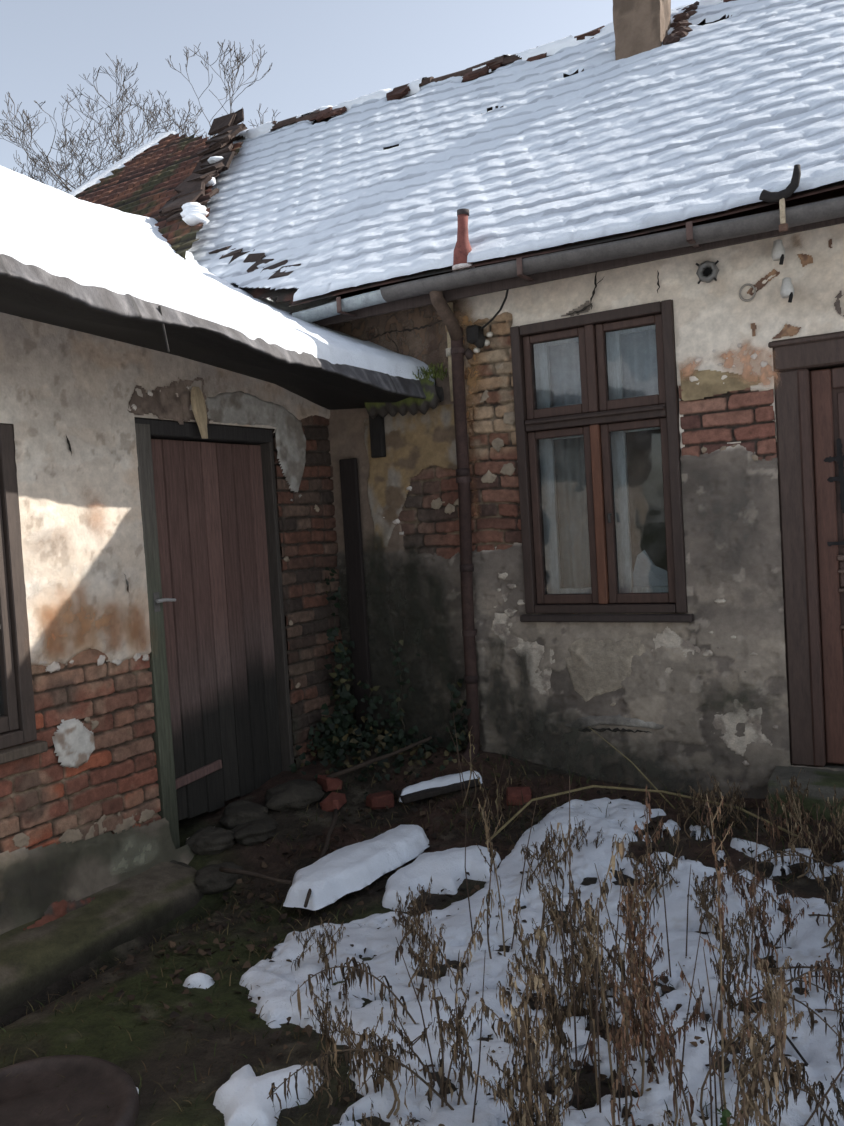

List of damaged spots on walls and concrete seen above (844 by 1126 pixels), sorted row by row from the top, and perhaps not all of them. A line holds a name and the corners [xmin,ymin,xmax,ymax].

flaking render [128,377,210,425]
flaking render [364,312,522,559]
flaking render [679,323,778,461]
peeling [772,324,801,339]
flaking render [0,648,161,853]
water stain [485,641,694,796]
flaking render [699,699,778,766]